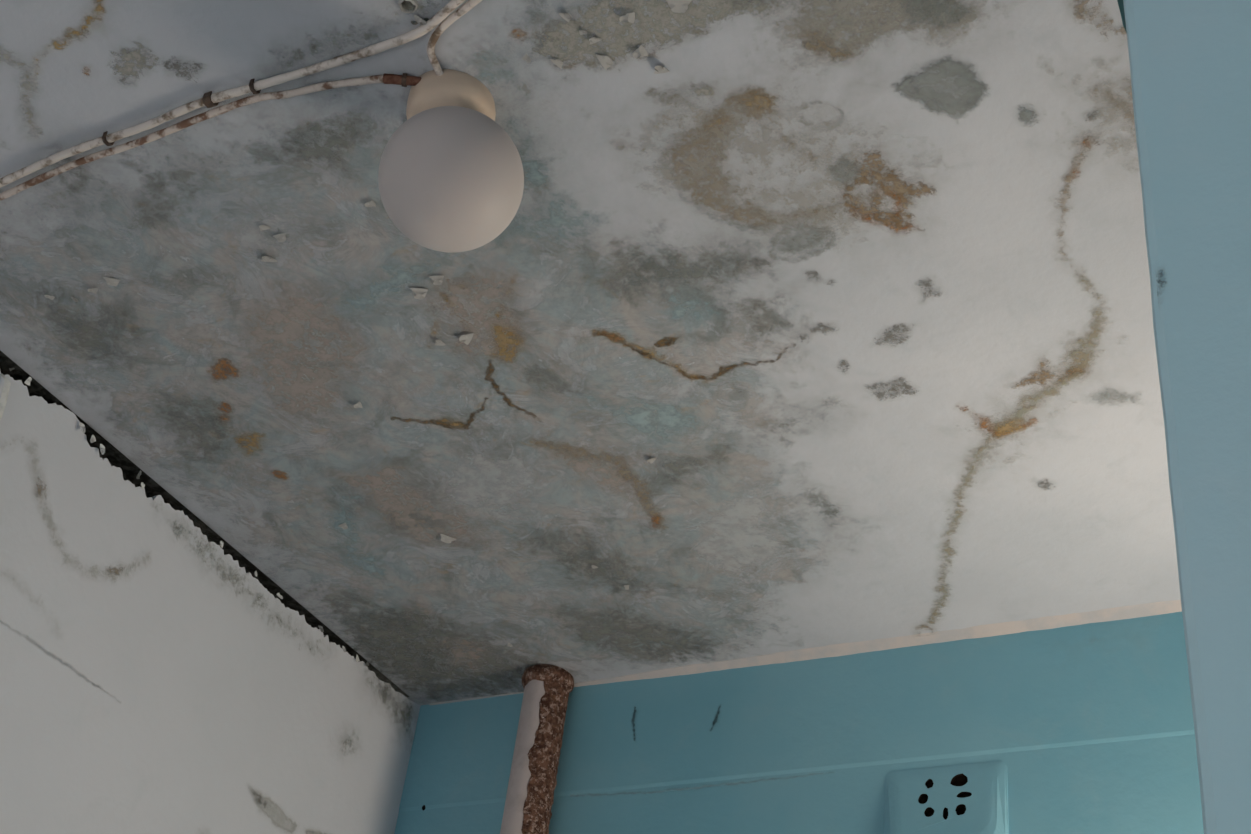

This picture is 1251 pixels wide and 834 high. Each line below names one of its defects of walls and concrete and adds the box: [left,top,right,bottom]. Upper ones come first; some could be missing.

peeling [512,0,779,74]
leakage [664,86,836,252]
leakage [0,117,816,698]
crack [593,330,795,380]
leakage [868,380,916,400]
leakage [877,325,908,345]
crack [0,350,409,697]